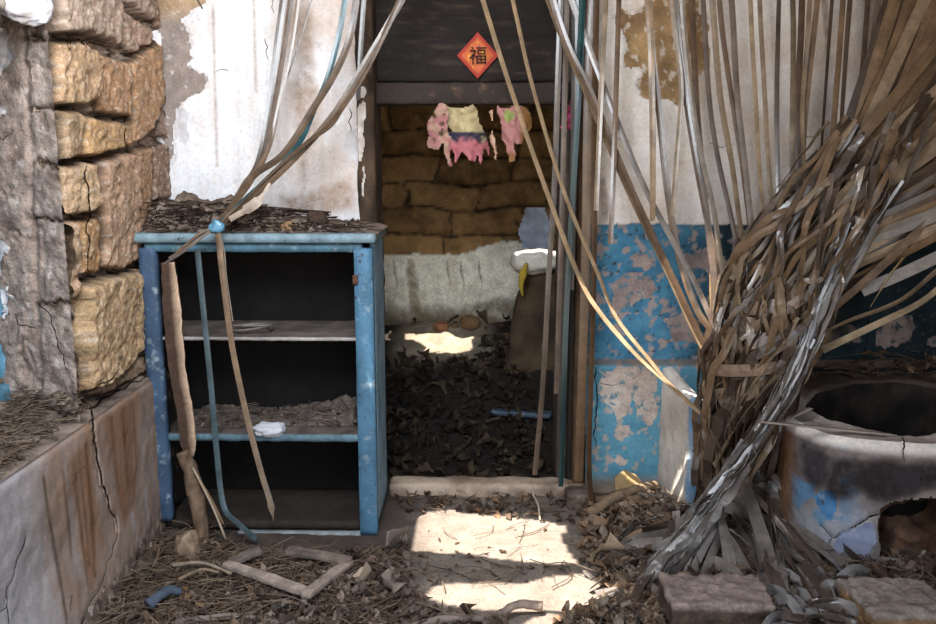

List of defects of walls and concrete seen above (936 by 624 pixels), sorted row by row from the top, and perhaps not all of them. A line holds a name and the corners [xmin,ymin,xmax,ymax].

peeling [157,0,209,162]
flaking render [615,0,711,106]
crack [83,166,91,273]
peeling [611,251,658,311]
crack [16,302,66,369]
peeling [876,315,916,349]
peeling [597,367,659,442]
crack [69,373,147,624]
crack [820,514,879,543]
crack [0,535,26,621]